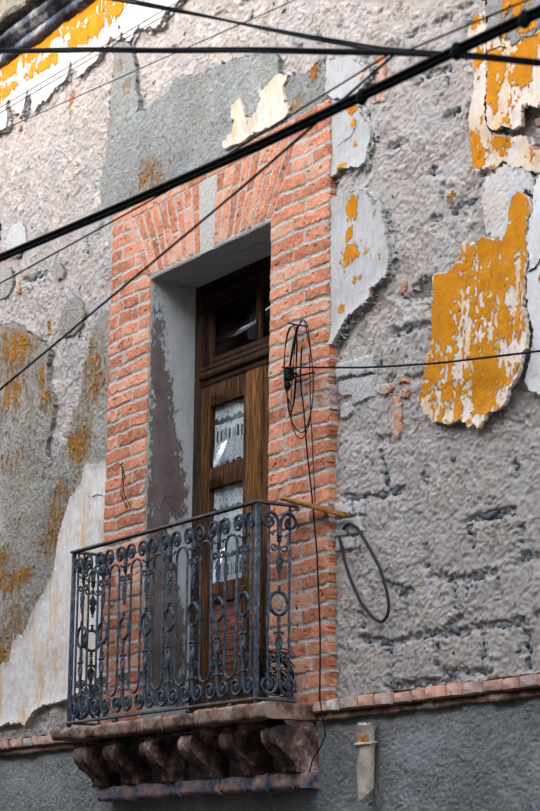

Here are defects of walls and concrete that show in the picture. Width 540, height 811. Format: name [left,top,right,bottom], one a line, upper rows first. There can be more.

flaking render [0,216,113,740]
spalling [0,0,540,253]
spalling [329,18,540,698]